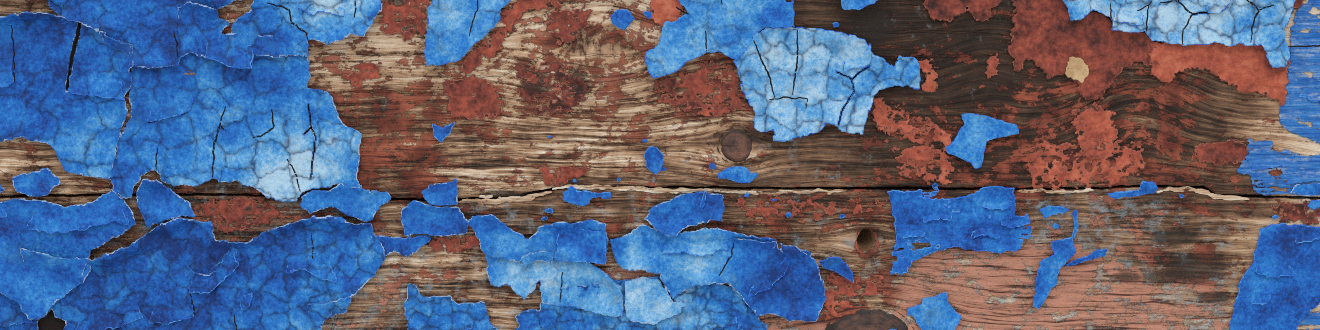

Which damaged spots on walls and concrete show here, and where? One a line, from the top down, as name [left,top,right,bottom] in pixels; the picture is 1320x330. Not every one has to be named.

crack [66,22,81,90]
crack [212,90,432,192]
peeling [0,0,854,330]
peeling [611,0,939,142]
crack [753,30,808,108]
crack [837,67,869,125]
peeling [944,113,1019,169]
crack [1110,0,1209,45]
peeling [1063,0,1320,210]
crack [1246,0,1274,43]
peeling [823,164,1107,309]
peeling [1229,215,1320,330]